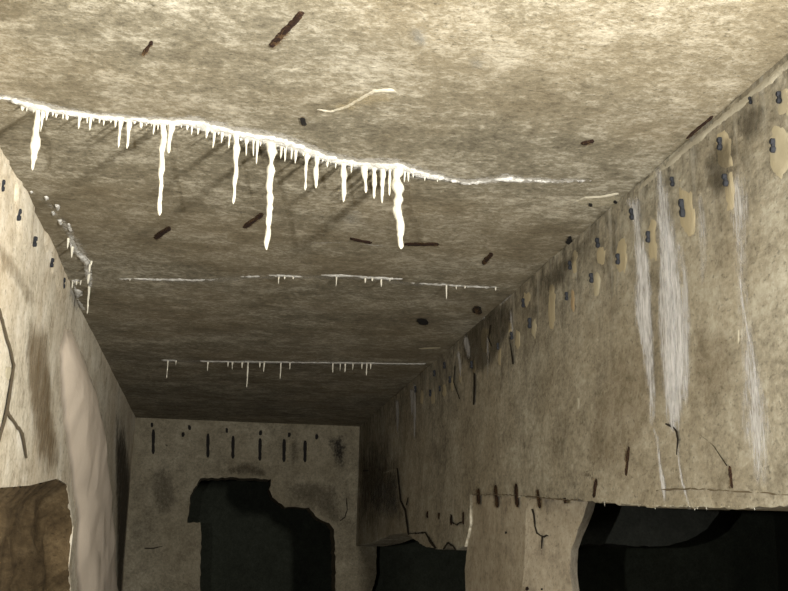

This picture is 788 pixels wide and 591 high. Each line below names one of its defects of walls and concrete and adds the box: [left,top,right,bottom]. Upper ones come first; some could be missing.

corrosion [269,11,304,48]
peeling [634,61,788,211]
crack [0,95,591,250]
water stain [44,196,93,313]
corrosion [153,226,171,240]
corrosion [243,213,264,228]
peeling [679,187,695,237]
water stain [632,173,687,429]
crack [665,423,679,455]
water stain [604,453,755,510]
spalling [0,479,72,591]
crack [474,493,578,549]